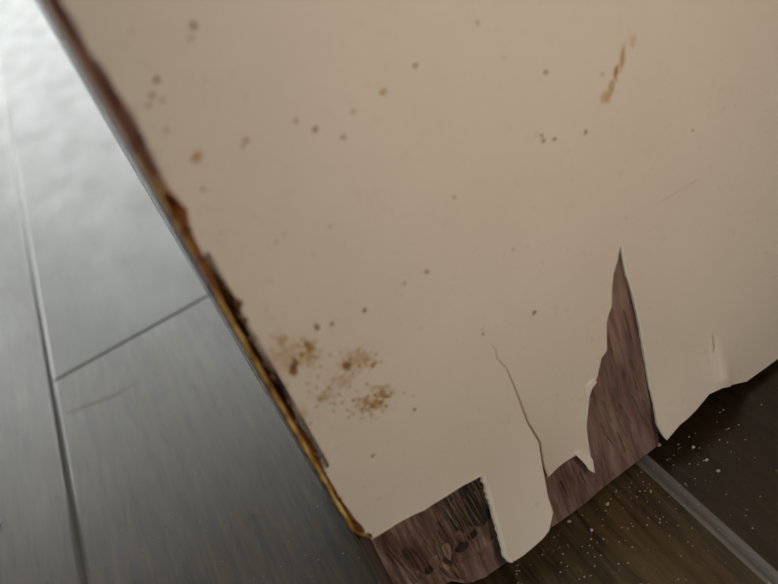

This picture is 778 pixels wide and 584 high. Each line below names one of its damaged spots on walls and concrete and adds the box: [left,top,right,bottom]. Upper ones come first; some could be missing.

crack [490,343,549,477]
peeling [584,379,597,396]
peeling [574,450,595,473]
peeling [425,530,506,582]